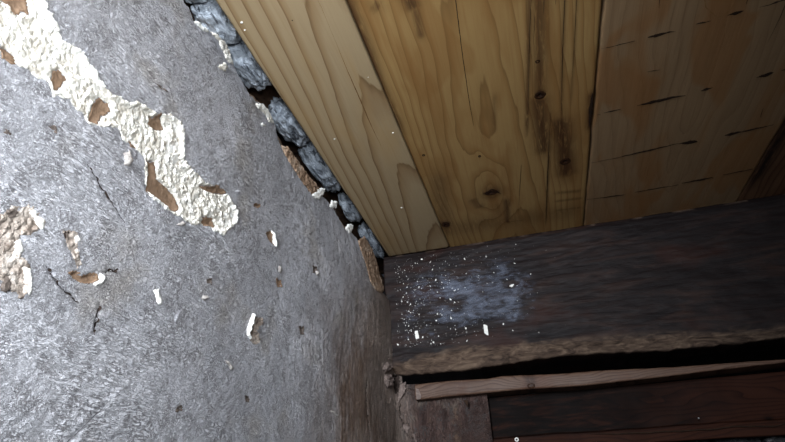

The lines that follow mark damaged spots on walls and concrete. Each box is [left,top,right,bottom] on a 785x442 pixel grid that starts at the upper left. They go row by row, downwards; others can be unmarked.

flaking render [0,0,239,236]
flaking render [250,94,274,127]
flaking render [0,204,46,299]
flaking render [62,230,119,286]
spalling [247,313,264,344]